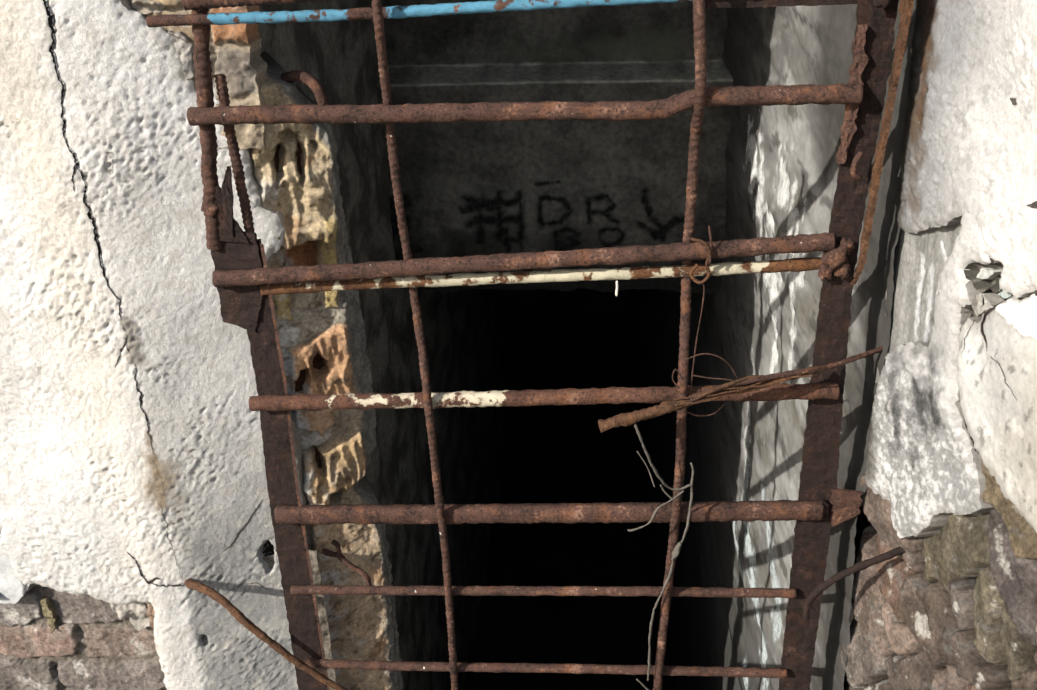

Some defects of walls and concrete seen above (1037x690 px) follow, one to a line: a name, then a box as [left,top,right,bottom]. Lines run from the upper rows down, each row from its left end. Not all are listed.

flaking render [129,0,196,89]
flaking render [207,5,269,107]
corrosion [911,45,930,142]
flaking render [218,124,281,173]
crack [43,0,184,587]
flaking render [964,256,1013,318]
spalling [295,353,324,392]
flaking render [261,539,275,569]
flaking render [0,551,167,690]
flaking render [309,550,336,690]